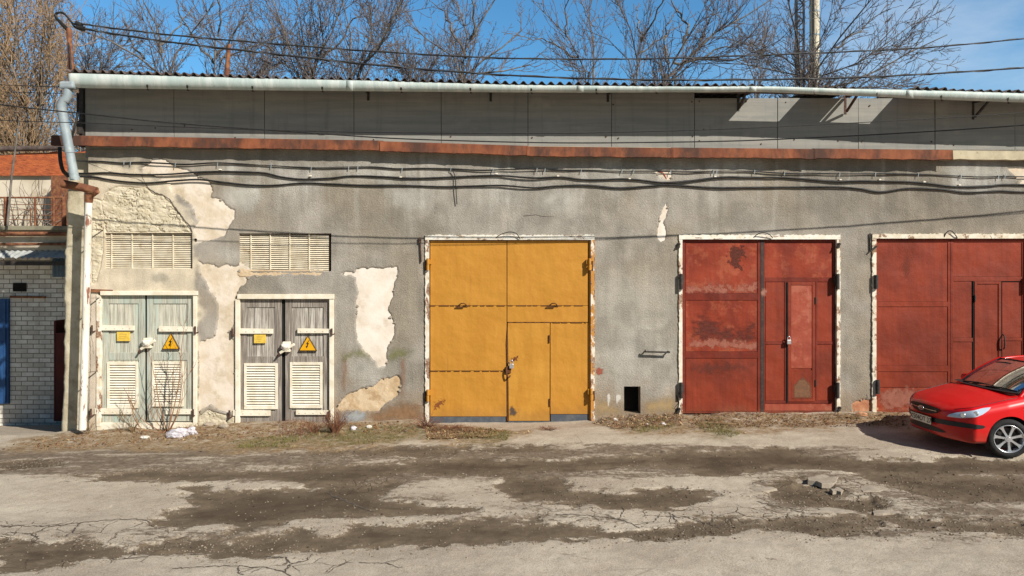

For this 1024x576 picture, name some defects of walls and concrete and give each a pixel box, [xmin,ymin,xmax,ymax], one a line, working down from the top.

spalling [91,158,235,283]
flaking render [657,204,669,242]
rust [727,245,746,271]
flaking render [336,267,402,412]
rust [694,316,755,343]
rust [794,378,811,398]
crack [3,522,82,543]